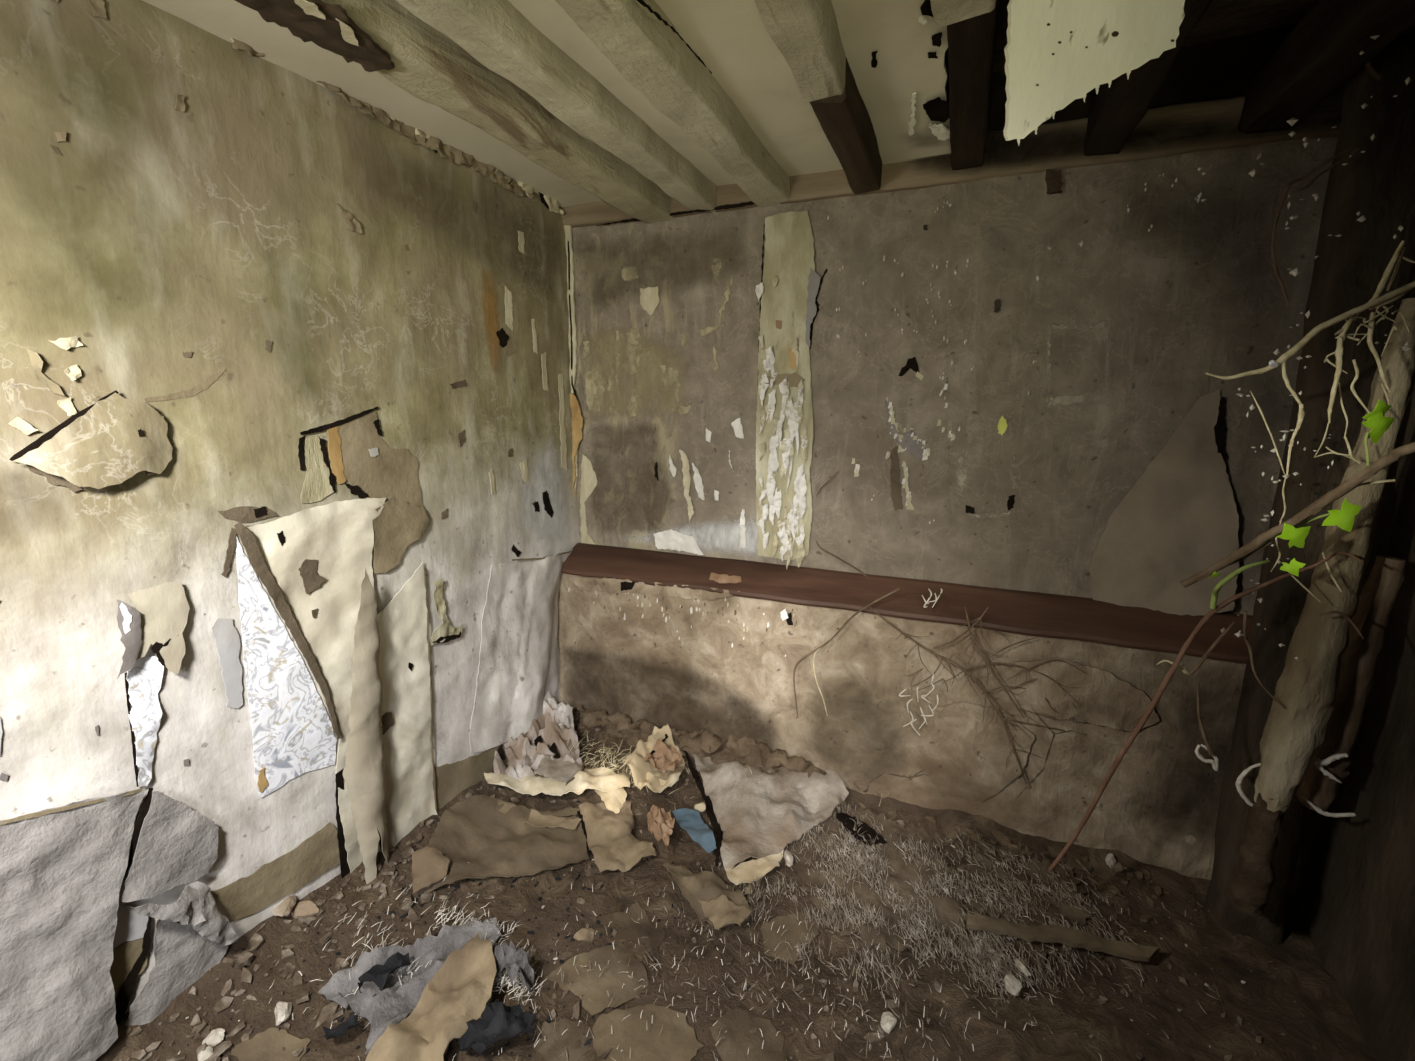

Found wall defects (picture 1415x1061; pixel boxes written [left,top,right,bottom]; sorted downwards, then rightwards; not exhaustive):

spalling [230,0,395,72]
spalling [316,81,564,215]
peeling [25,336,83,416]
peeling [9,417,38,435]
peeling [729,335,808,569]
spalling [218,506,279,523]
peeling [654,450,719,555]
leakage [679,524,758,552]